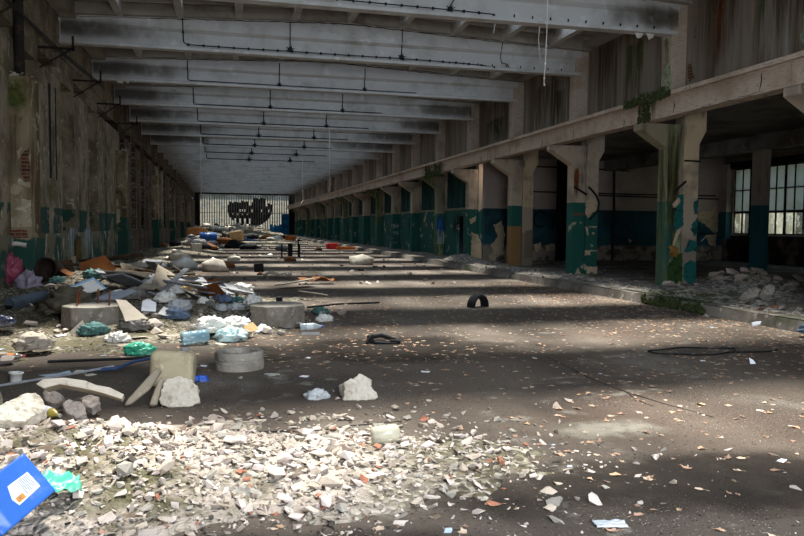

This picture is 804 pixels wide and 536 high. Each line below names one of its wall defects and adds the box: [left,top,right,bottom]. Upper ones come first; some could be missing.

peeling [585,199,598,236]
peeling [667,194,718,284]